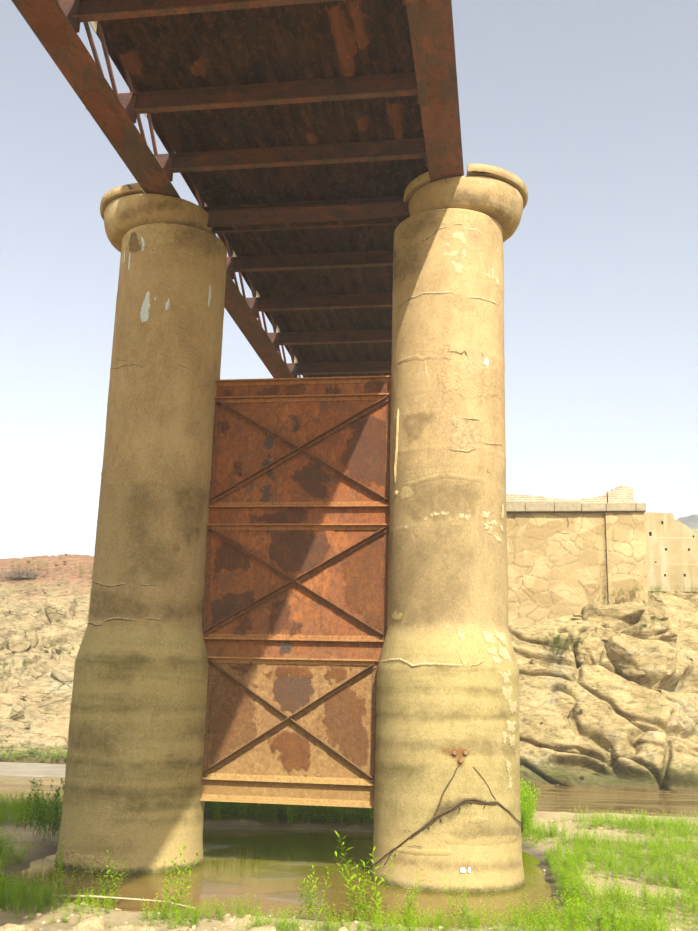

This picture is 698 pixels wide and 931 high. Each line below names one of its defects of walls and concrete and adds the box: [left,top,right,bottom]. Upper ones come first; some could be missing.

crack [380,658,481,667]